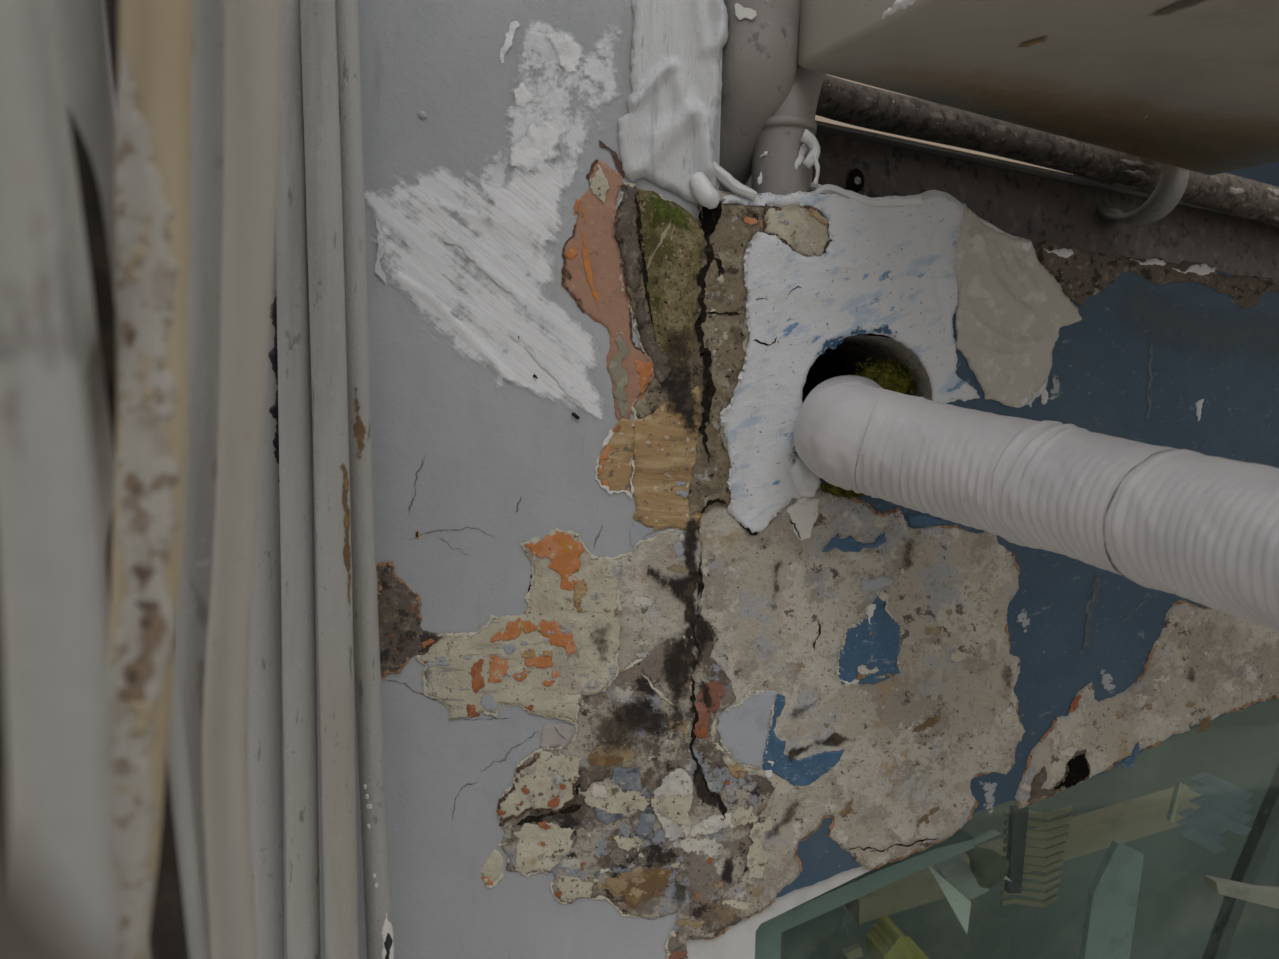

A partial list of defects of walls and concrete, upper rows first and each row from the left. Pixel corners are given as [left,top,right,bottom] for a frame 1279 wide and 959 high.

crack [634,193,654,328]
crack [694,231,802,462]
peeling [108,51,180,959]
crack [701,498,758,536]
flaking render [376,140,1279,959]
crack [641,628,727,820]